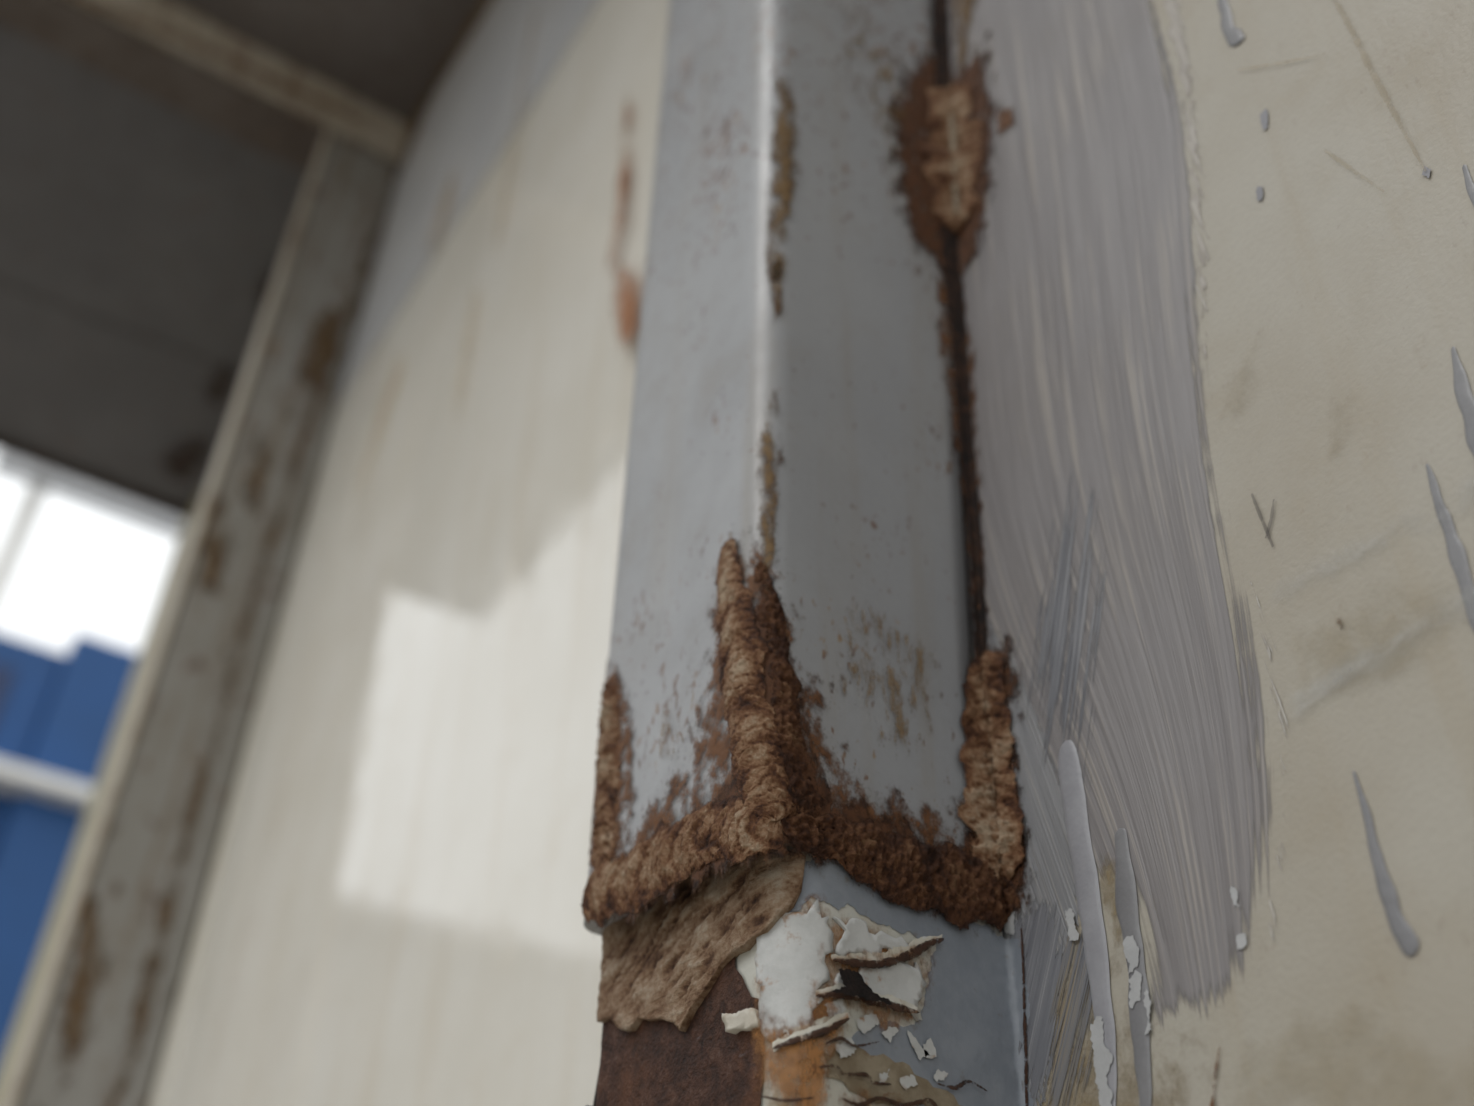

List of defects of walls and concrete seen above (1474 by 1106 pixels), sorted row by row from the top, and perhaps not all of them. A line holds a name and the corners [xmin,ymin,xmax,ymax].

rust [609,102,641,345]
rust [765,79,798,317]
rust [888,0,1014,275]
rust [588,581,744,867]
rust [736,391,978,853]
rust [988,632,1023,800]
rust [596,957,837,1106]
peeling [597,849,961,1106]
peeling [1004,911,1015,935]
peeling [1065,908,1079,941]
peeling [1090,1016,1113,1106]
peeling [1123,935,1152,1035]